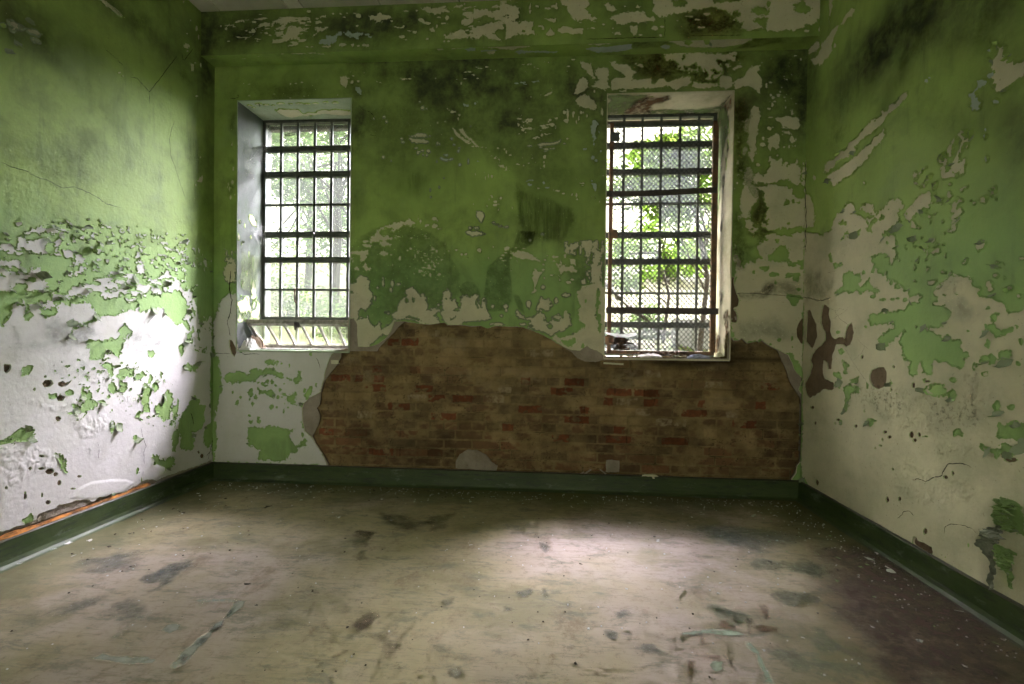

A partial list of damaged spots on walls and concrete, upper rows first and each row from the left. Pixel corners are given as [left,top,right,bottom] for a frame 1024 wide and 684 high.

peeling [220,10,418,55]
peeling [403,0,820,55]
peeling [513,38,773,170]
peeling [968,41,1024,112]
crack [2,162,117,207]
flaking render [0,71,1024,606]
crack [915,463,970,482]